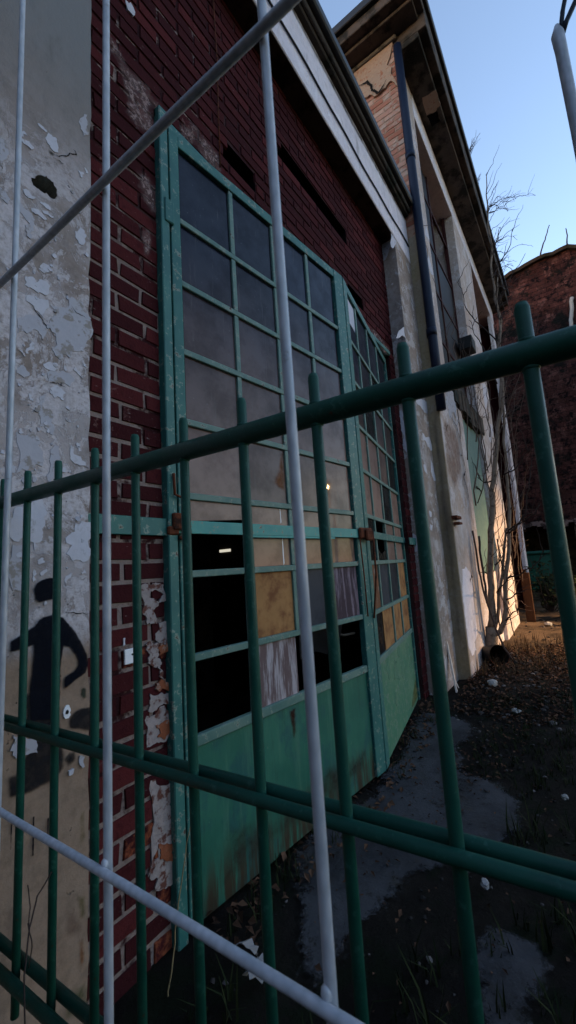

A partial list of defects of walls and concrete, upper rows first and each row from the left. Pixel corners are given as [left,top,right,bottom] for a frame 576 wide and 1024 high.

crack [359,79,387,94]
peeling [79,114,89,137]
peeling [38,123,58,153]
peeling [12,175,93,484]
spalling [156,719,170,740]